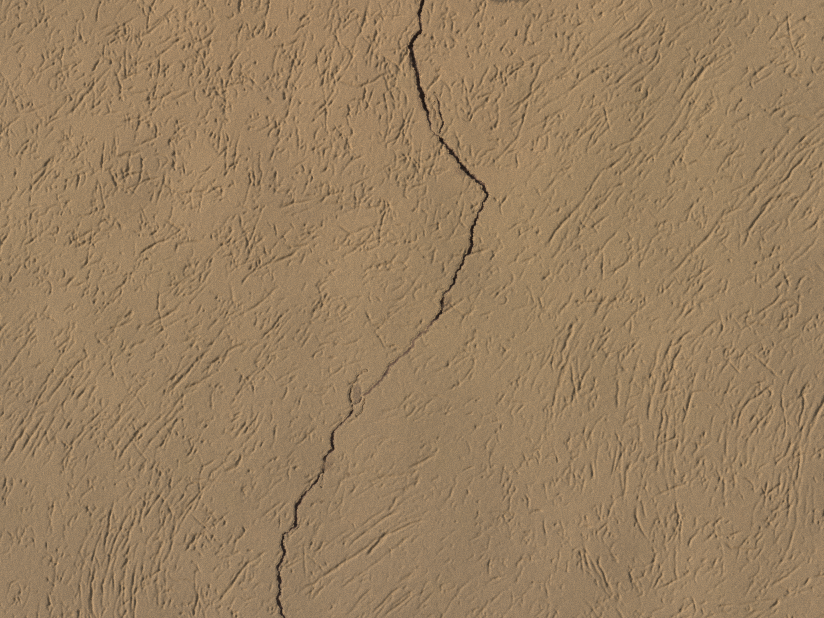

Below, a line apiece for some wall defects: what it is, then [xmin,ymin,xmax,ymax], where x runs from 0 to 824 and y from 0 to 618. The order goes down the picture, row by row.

crack [275,0,491,618]